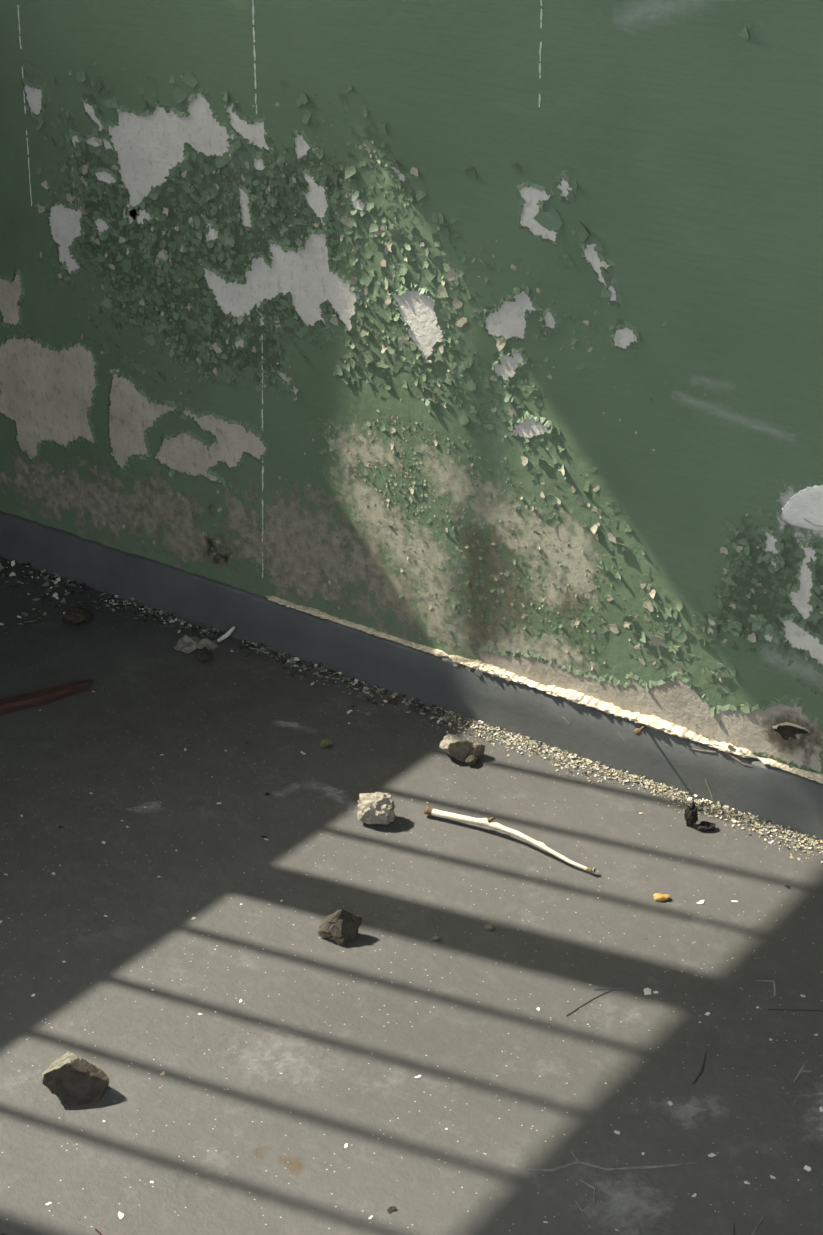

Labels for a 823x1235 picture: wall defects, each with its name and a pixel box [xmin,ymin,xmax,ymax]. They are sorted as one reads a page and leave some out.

peeling [20,78,46,130]
peeling [0,268,270,489]
peeling [44,86,823,784]